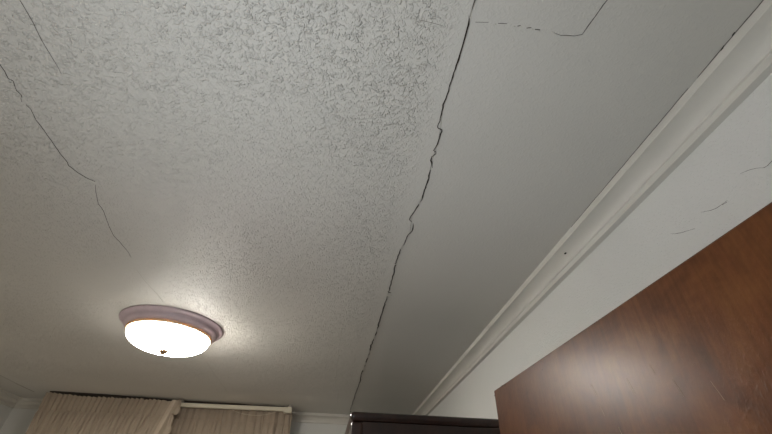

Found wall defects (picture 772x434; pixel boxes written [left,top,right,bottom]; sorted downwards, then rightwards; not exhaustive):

crack [20,1,61,73]
crack [494,0,607,36]
crack [0,65,163,302]
crack [350,0,475,412]